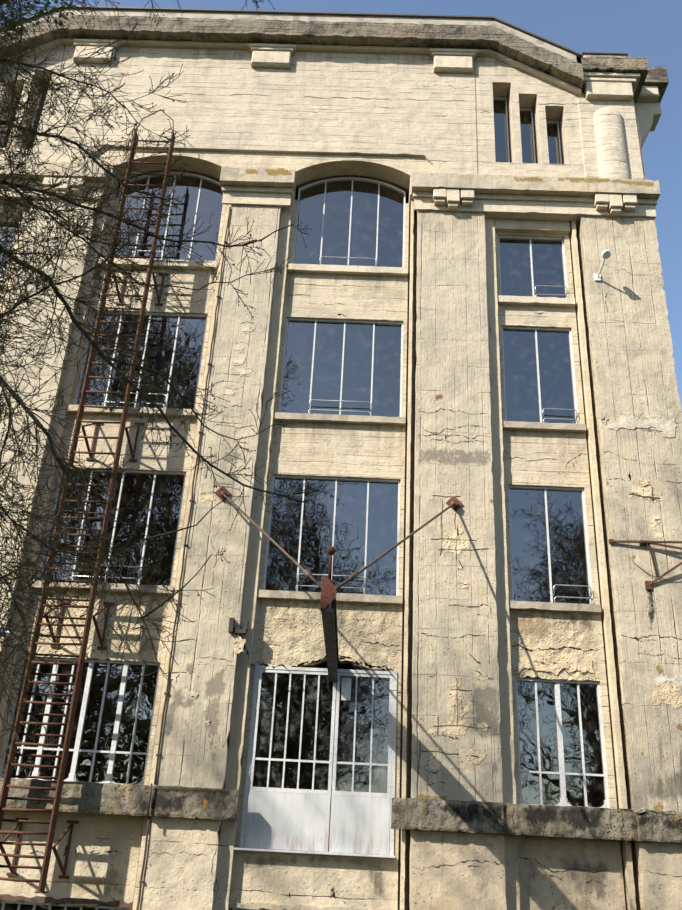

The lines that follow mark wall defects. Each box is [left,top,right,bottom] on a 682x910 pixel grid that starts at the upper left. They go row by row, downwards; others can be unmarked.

crack [418,408,486,444]
peeling [601,413,678,438]
damp [419,448,489,465]
crack [503,449,639,486]
spalling [624,478,663,503]
spalling [417,653,499,739]
spalling [651,680,682,708]
spalling [418,743,485,774]
damp [452,808,476,822]
crack [414,857,610,887]